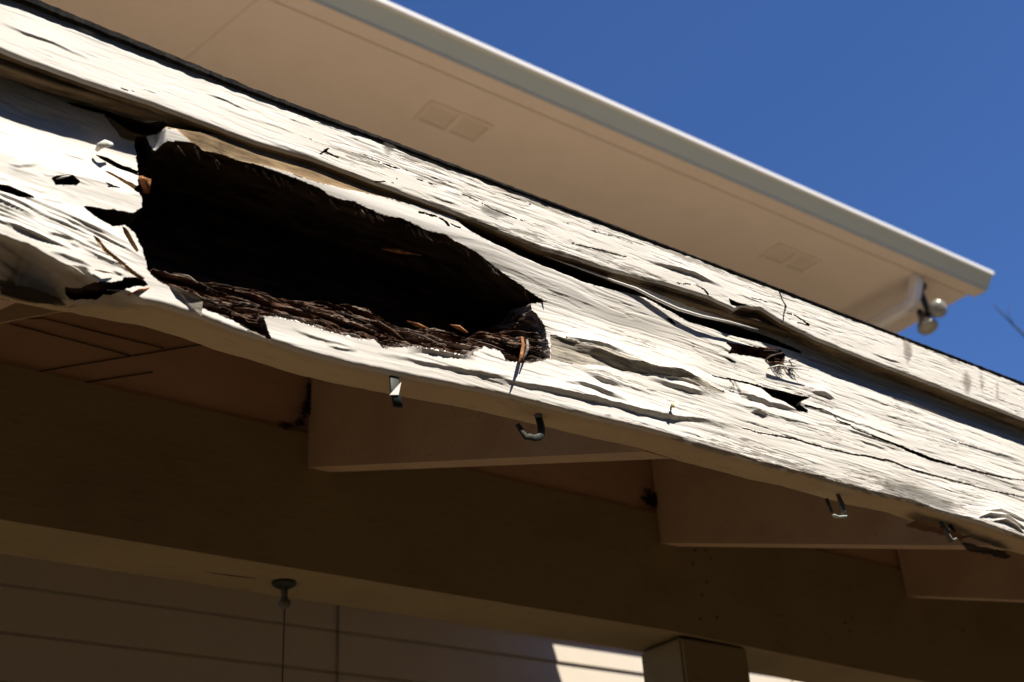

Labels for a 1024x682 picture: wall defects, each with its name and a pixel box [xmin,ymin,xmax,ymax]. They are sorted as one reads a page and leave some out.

spalling [84,115,543,339]
crack [751,291,810,326]
crack [712,375,1024,498]